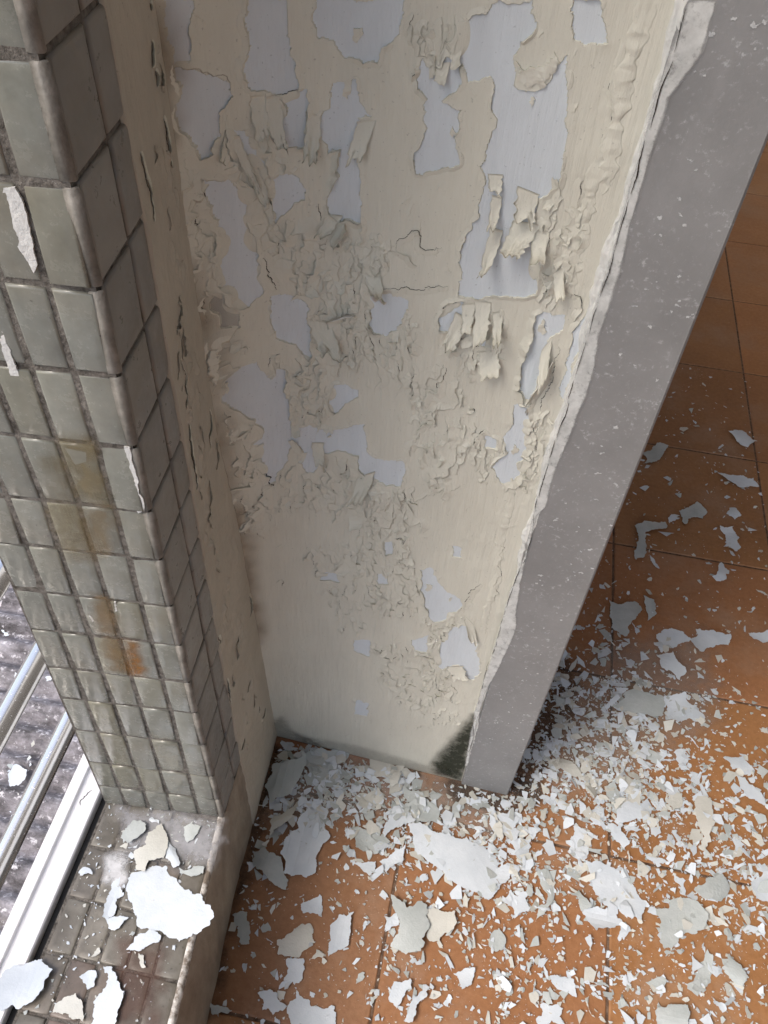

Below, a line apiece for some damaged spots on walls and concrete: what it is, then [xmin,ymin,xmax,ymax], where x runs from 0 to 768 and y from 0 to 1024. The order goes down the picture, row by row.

peeling [571,0,607,45]
peeling [164,0,591,698]
crack [460,9,686,704]
peeling [643,442,668,463]
peeling [634,521,668,559]